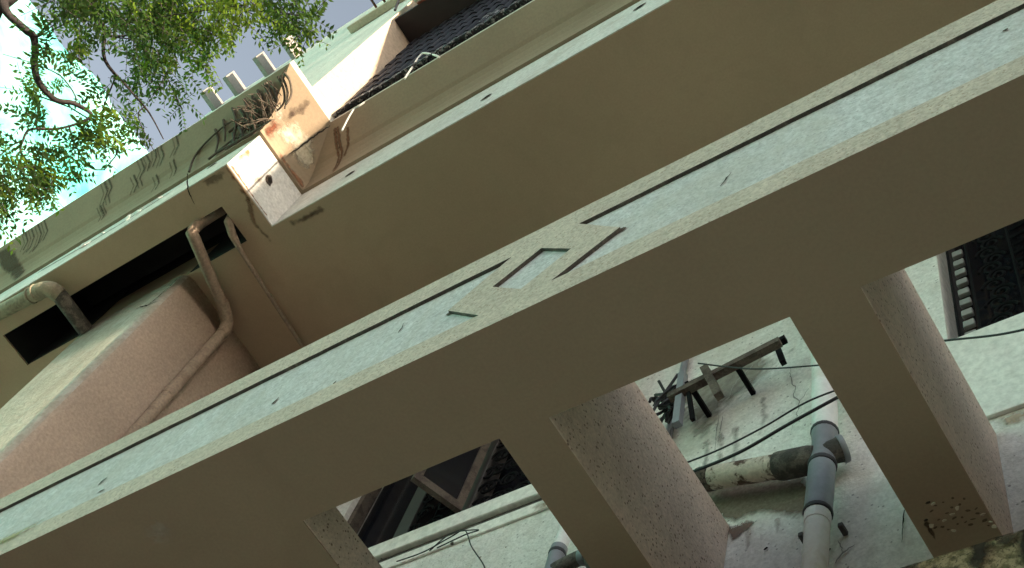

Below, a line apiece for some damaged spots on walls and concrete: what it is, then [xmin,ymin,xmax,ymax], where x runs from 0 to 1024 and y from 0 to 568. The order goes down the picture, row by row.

crack [291,125,330,153]
leakage [707,477,806,540]